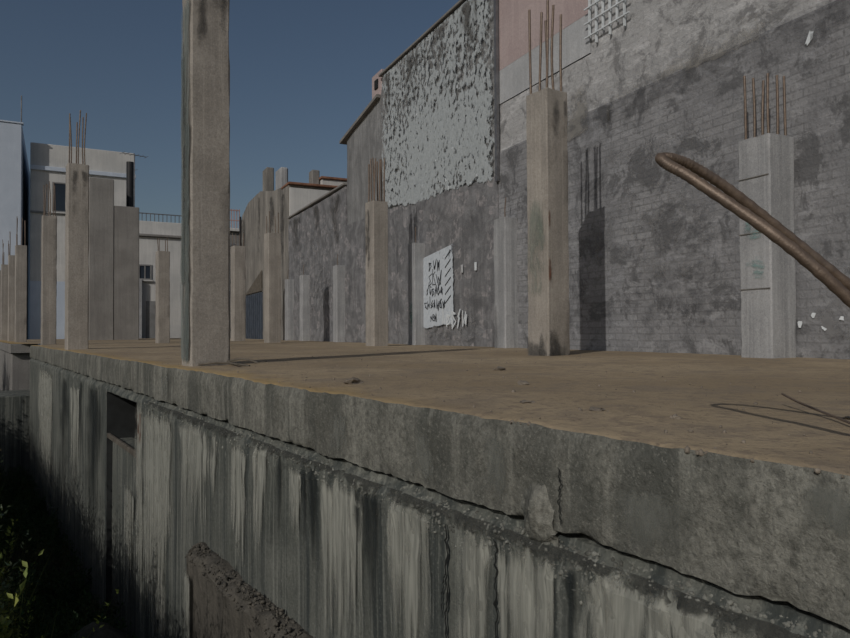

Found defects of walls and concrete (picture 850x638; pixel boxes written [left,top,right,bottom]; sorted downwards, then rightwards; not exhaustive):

peeling [368,0,495,207]
damp [38,371,100,513]
crack [441,524,449,638]
damp [124,401,809,638]
crack [555,467,563,525]